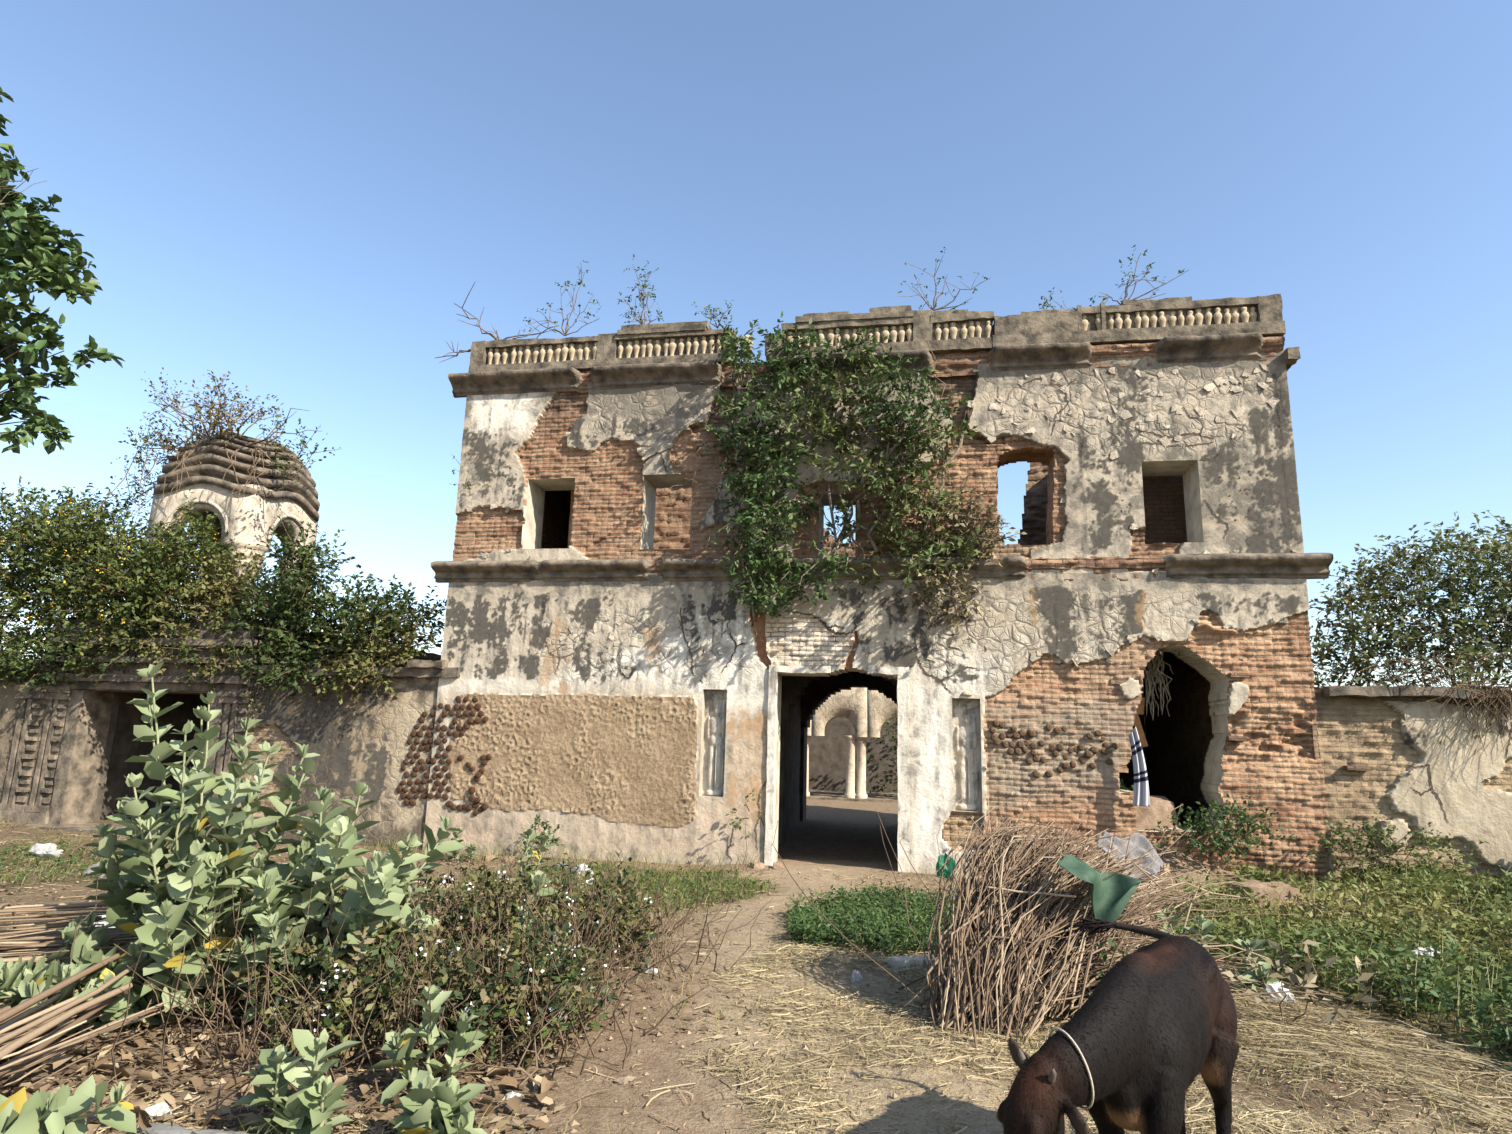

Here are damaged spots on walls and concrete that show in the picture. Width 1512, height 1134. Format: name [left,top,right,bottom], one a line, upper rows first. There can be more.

flaking render [453,377,749,561]
flaking render [792,364,1280,557]
leakage [1074,361,1153,554]
leakage [1201,374,1302,553]
leakage [445,591,636,683]
leakage [682,592,740,643]
flaking render [766,615,858,668]
leakage [1030,585,1146,660]
leakage [1197,589,1300,624]
flaking render [942,610,1332,880]